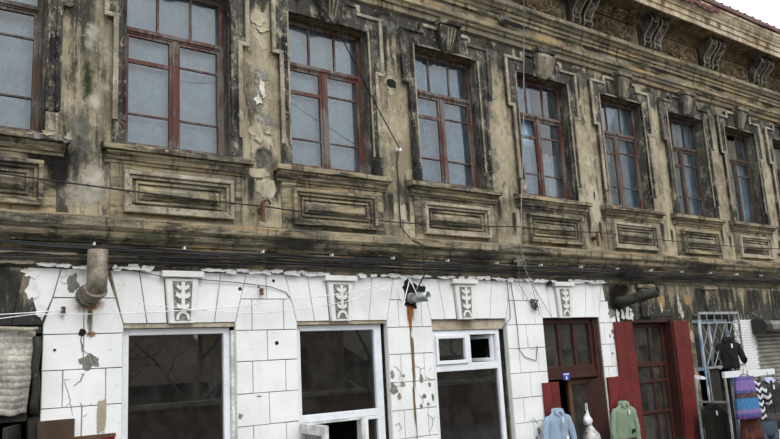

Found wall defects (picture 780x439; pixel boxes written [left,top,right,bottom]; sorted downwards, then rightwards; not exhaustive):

water stain [85,24,99,48]
water stain [566,38,606,54]
water stain [25,63,104,203]
spalling [248,69,277,198]
water stain [256,148,279,189]
water stain [275,240,315,257]
peeling [108,264,155,272]
peeling [0,249,87,318]
water stain [677,288,705,308]
rust [79,301,100,337]
spalling [78,354,99,371]
peeling [390,370,406,400]